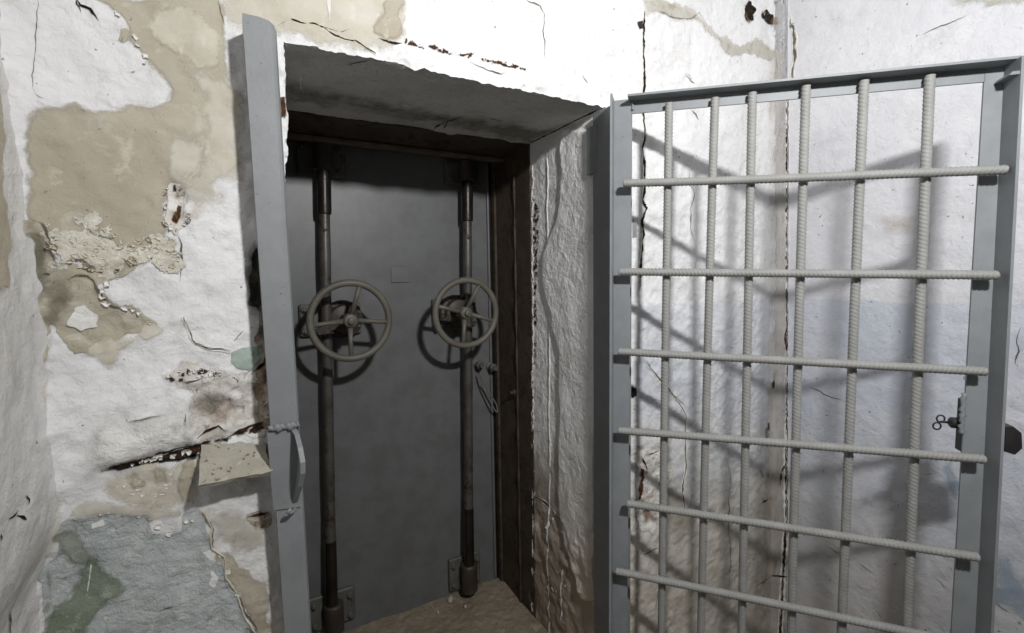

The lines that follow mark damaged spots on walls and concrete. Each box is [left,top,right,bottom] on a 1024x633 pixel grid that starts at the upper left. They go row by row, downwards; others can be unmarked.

crack [32,3,42,98]
peeling [22,0,243,368]
crack [276,18,399,65]
corrosion [405,38,526,71]
crack [634,10,649,288]
spalling [745,1,776,24]
peeling [38,249,272,633]
crack [757,14,841,633]